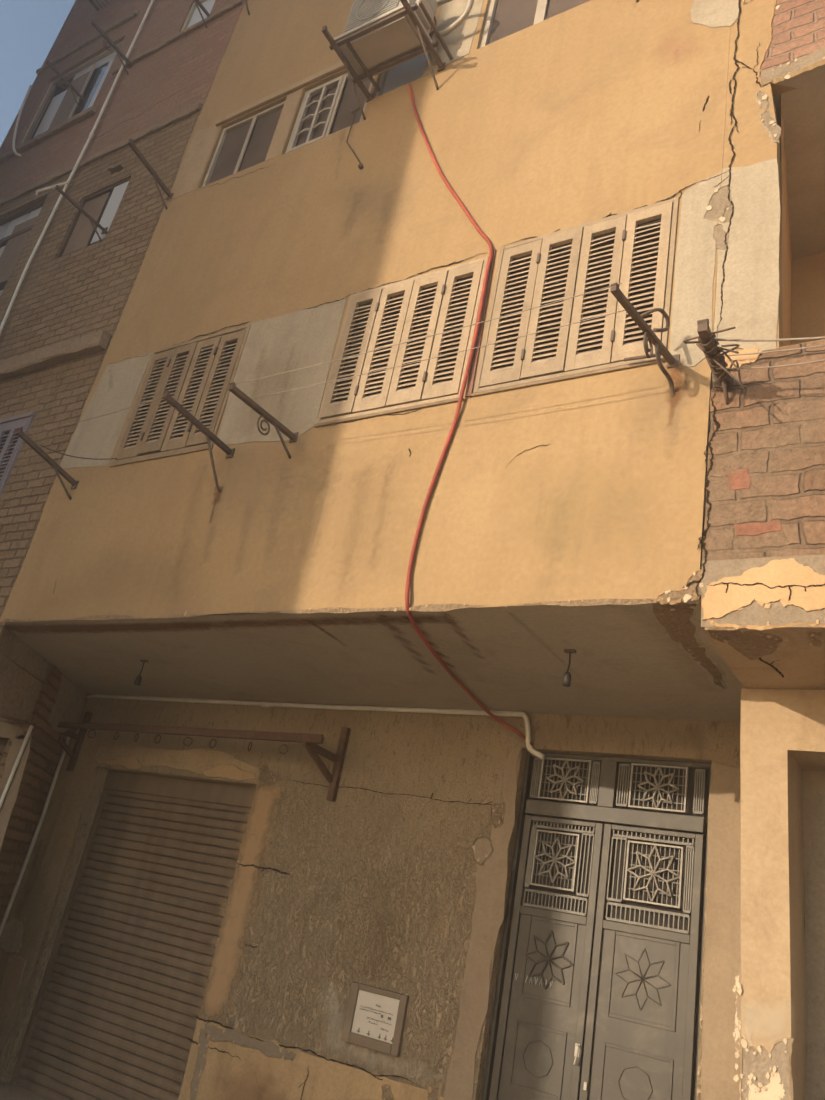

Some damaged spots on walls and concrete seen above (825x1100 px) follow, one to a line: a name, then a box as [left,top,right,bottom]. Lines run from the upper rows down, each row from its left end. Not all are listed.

peeling [690,0,753,28]
spalling [755,0,825,143]
crack [604,0,761,334]
crack [682,393,825,601]
spalling [506,569,825,689]
crack [293,780,493,805]
crack [237,863,289,875]
crack [188,1016,426,1100]
peeling [732,976,794,1100]